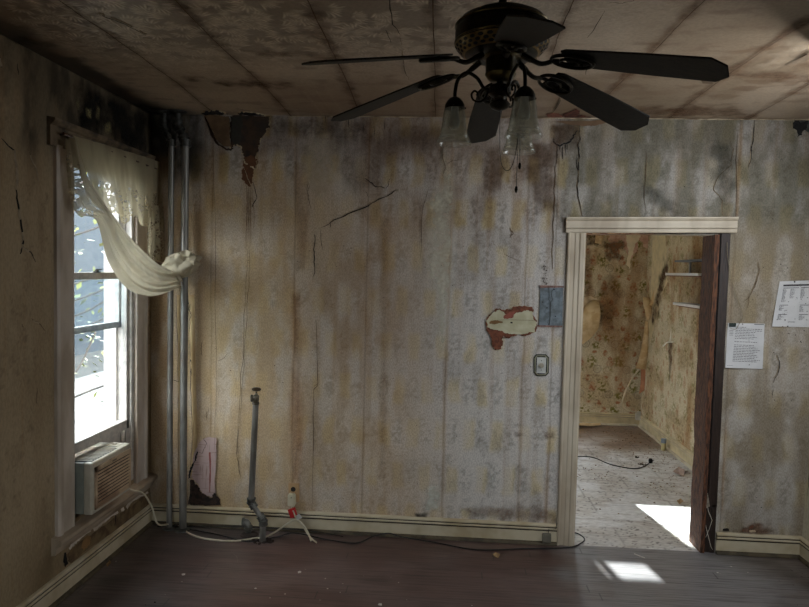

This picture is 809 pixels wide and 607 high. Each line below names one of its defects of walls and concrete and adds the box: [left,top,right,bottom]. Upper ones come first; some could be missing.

flaking render [202,110,270,157]
water stain [529,125,578,207]
flaking render [588,235,648,269]
peeling [486,305,537,350]
flaking render [188,437,221,506]